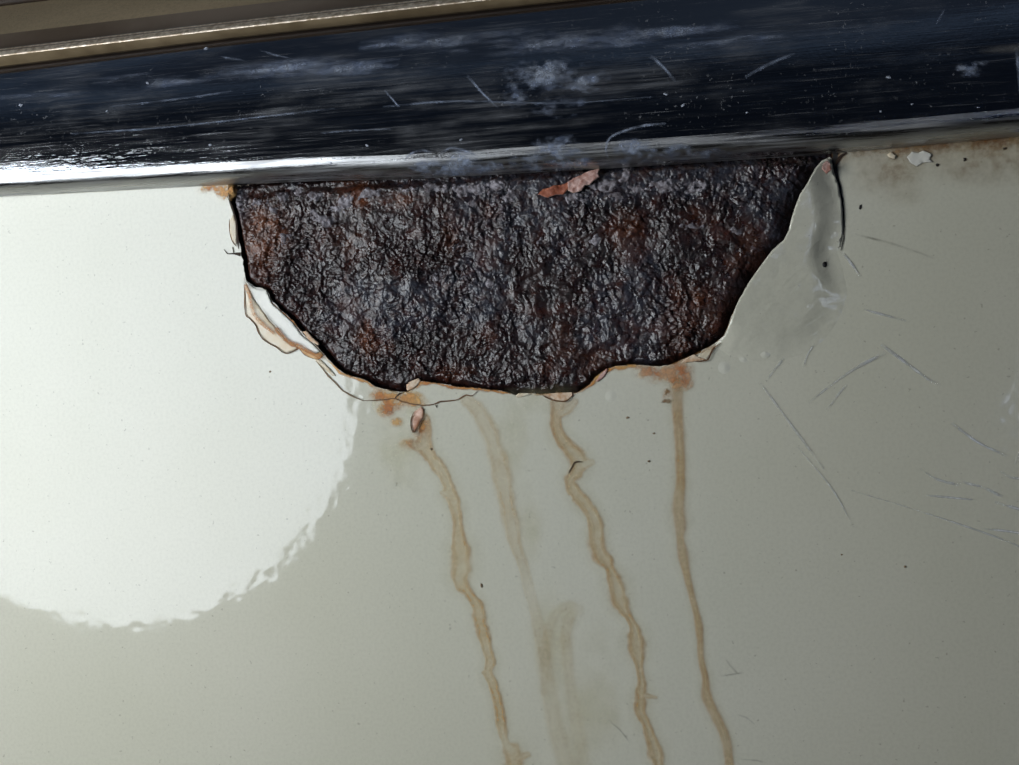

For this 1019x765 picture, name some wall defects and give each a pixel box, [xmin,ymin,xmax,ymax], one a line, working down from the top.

spalling [227,154,833,402]
rust [329,361,505,425]
rust [586,362,690,403]